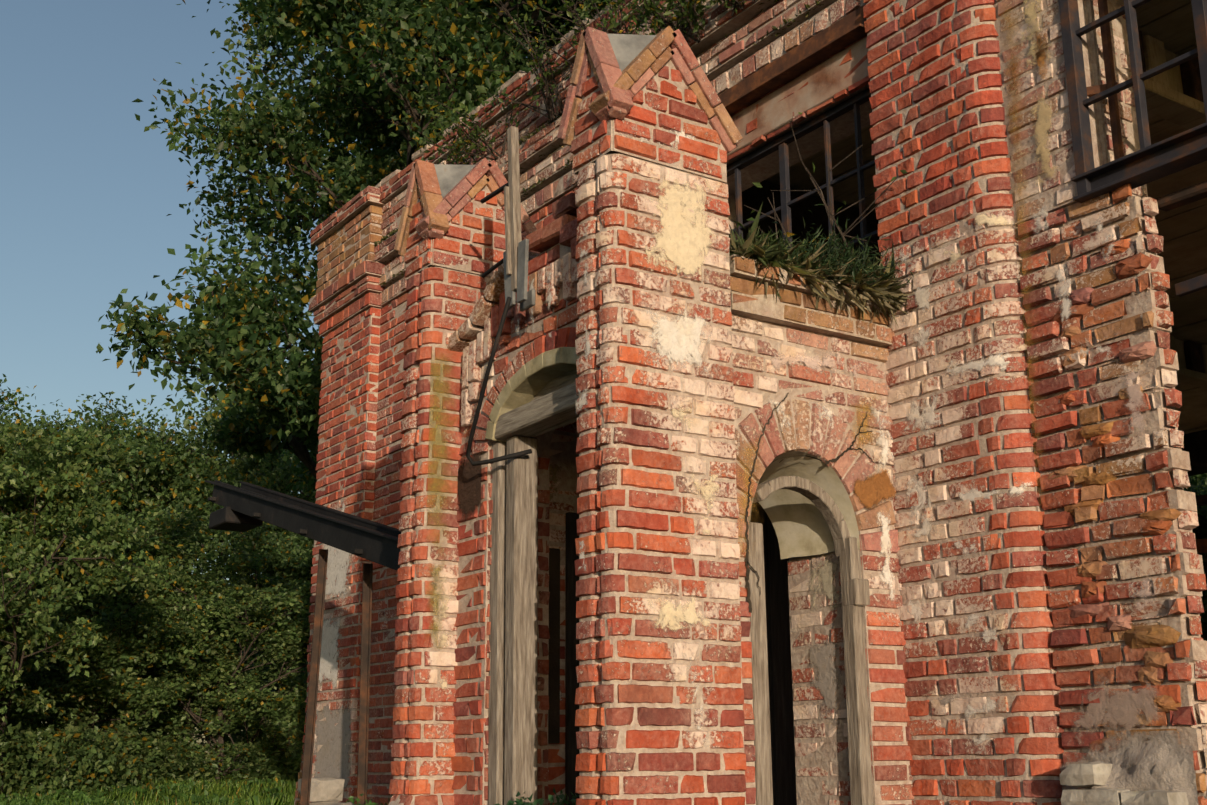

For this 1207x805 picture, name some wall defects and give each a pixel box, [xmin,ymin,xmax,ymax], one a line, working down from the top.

water stain [1035,34,1048,80]
peeling [645,179,713,276]
spalling [1096,218,1153,280]
peeling [649,310,711,371]
spalling [1050,265,1157,451]
peeling [691,474,719,535]
crack [745,393,873,613]
spalling [1048,465,1118,518]
spalling [1139,509,1182,536]
spalling [1065,560,1181,752]